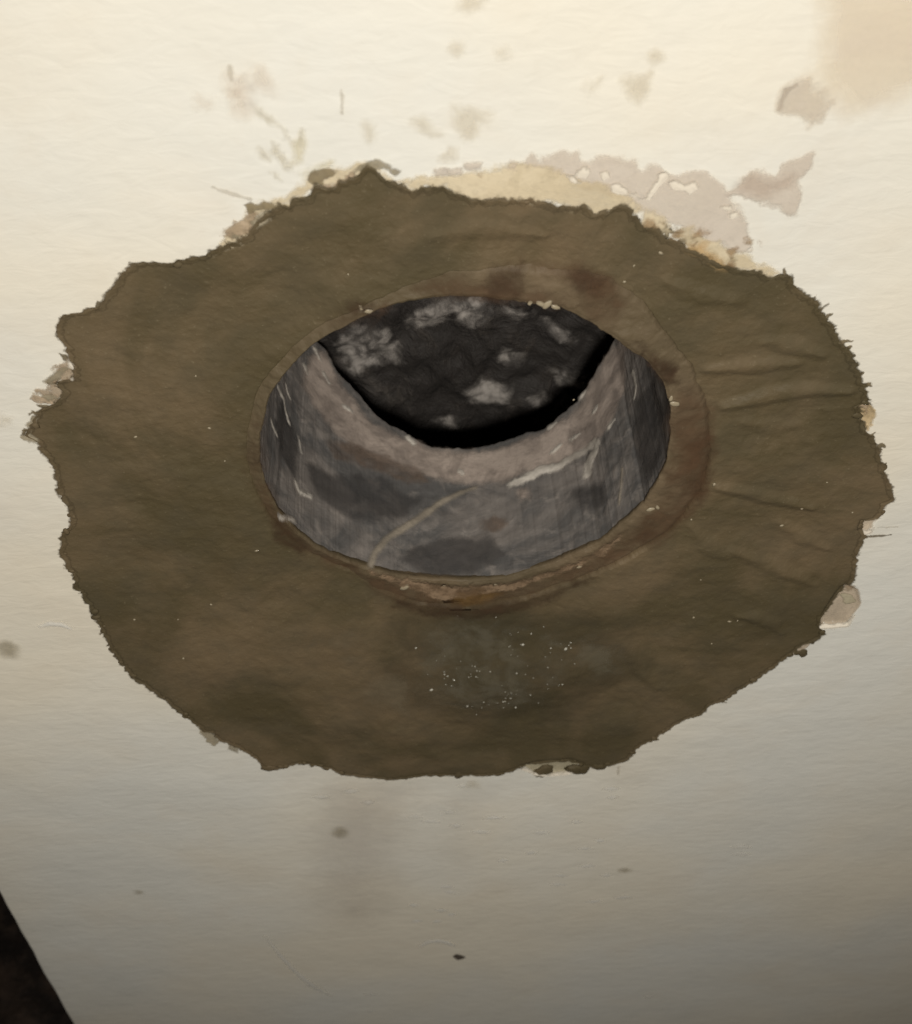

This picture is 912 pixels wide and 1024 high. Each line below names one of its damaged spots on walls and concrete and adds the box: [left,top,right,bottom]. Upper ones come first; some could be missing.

peeling [778,81,823,120]
peeling [221,151,813,278]
water stain [407,298,480,326]
water stain [339,329,395,373]
water stain [469,380,508,403]
water stain [508,434,599,498]
flaking render [819,585,861,629]